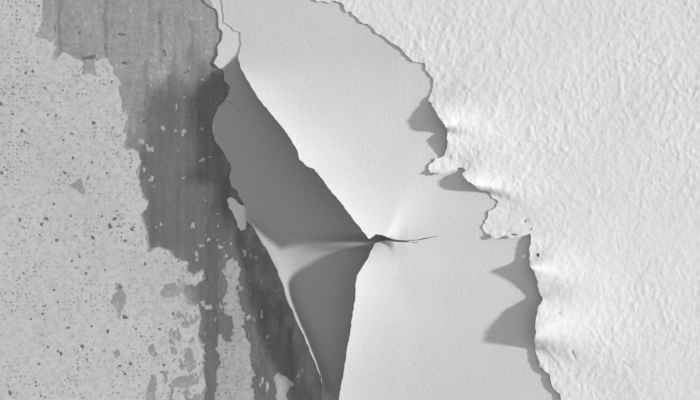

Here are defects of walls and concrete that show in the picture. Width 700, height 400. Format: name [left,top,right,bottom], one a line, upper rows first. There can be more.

peeling [36,0,391,400]
leakage [143,81,292,400]
crack [386,235,437,243]
peeling [222,0,700,400]